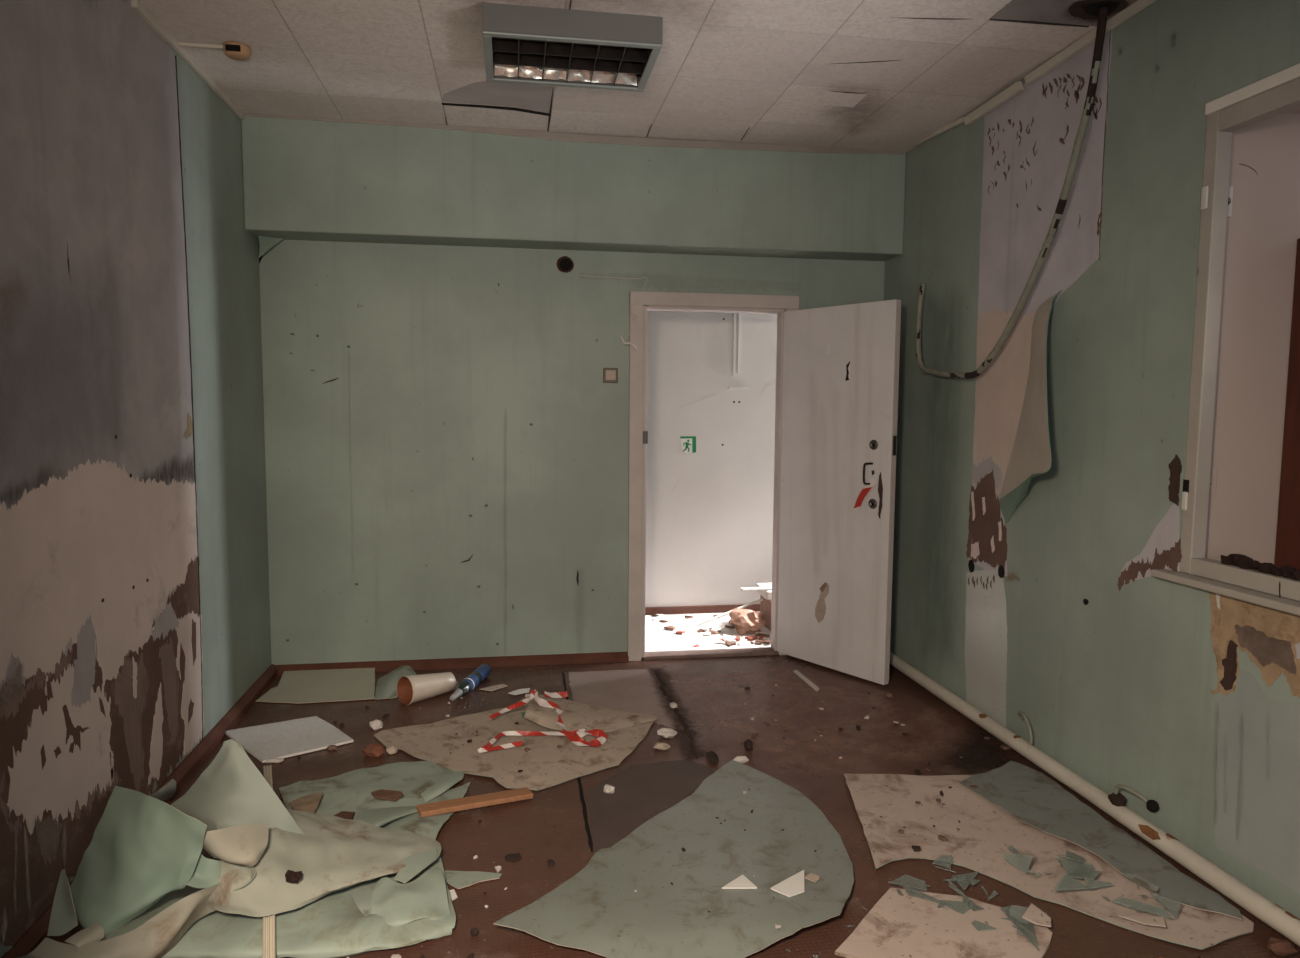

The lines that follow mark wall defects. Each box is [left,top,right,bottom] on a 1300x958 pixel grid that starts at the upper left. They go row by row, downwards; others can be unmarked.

spalling [1068,0,1129,22]
crack [442,90,553,132]
peeling [1042,74,1102,120]
peeling [987,118,1038,208]
water stain [143,461,194,483]
peeling [968,559,1005,590]
spalling [1209,592,1300,698]